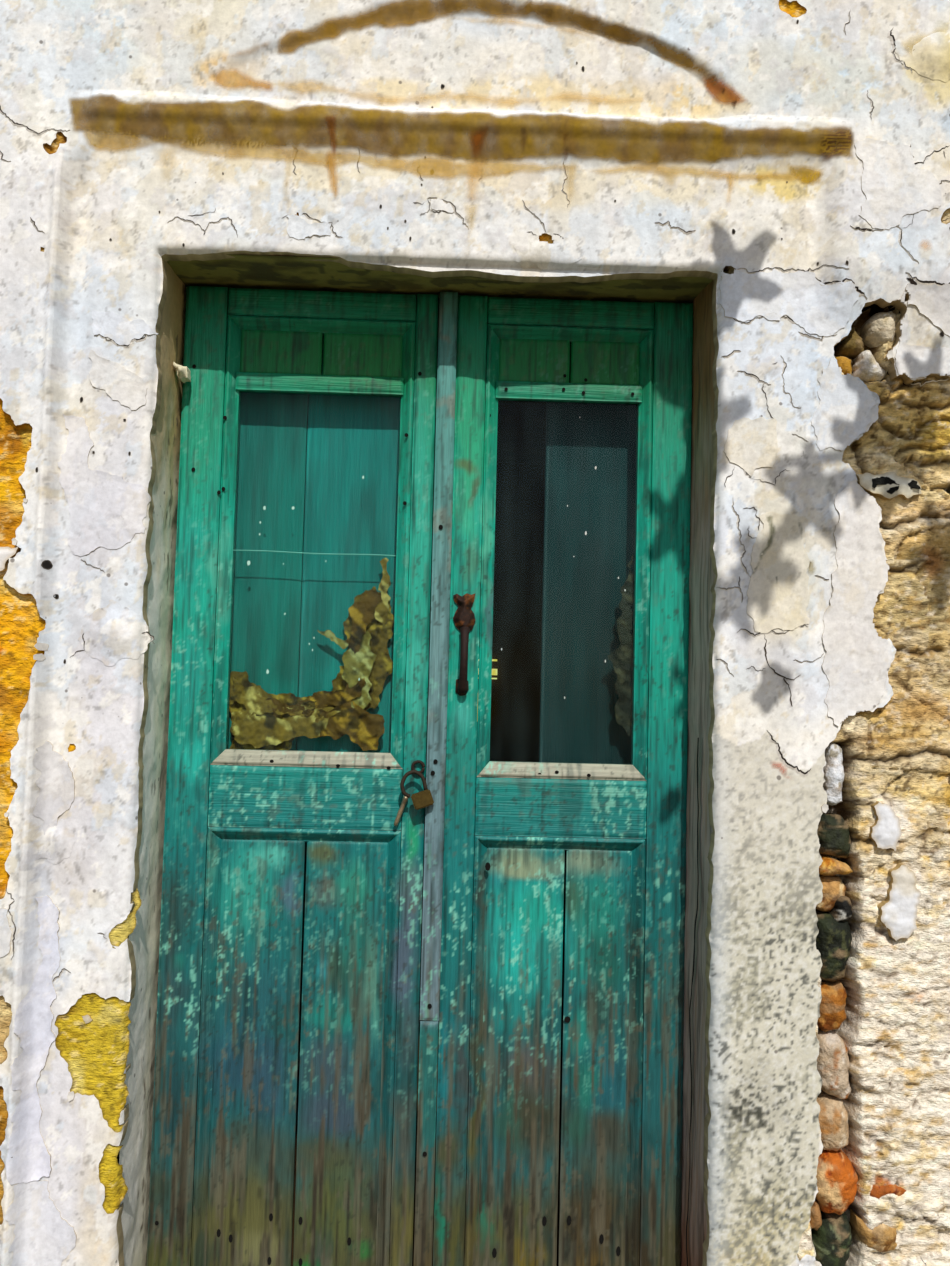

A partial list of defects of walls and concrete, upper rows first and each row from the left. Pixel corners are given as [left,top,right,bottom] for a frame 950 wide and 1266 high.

damp [279,0,714,78]
crack [0,106,70,162]
spalling [43,132,67,154]
damp [71,84,852,192]
crack [737,264,867,300]
crack [94,334,147,348]
peeling [57,397,151,556]
crack [716,313,837,707]
spalling [0,398,49,957]
crack [767,730,811,777]
spalling [717,262,950,1266]
peeling [0,895,131,1266]